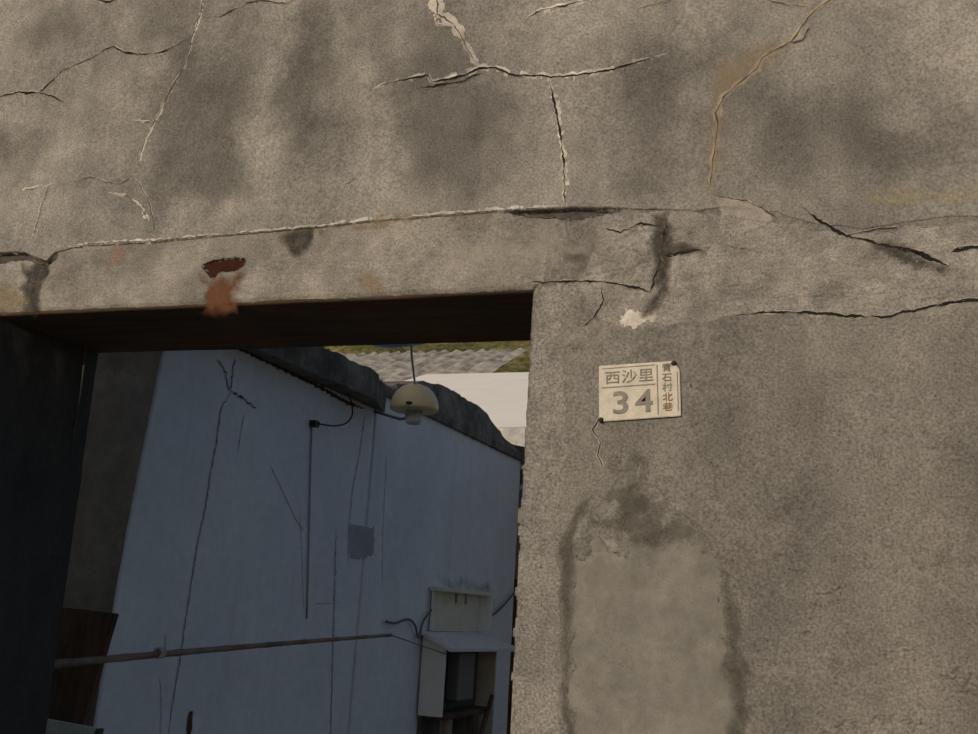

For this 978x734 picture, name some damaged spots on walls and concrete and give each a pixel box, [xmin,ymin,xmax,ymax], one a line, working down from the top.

crack [0,0,671,248]
crack [698,0,834,218]
corrosion [202,257,246,312]
crack [527,214,701,327]
water stain [644,217,703,315]
spalling [578,196,978,330]
crack [730,298,978,320]
crack [801,206,978,267]
crack [160,358,256,734]